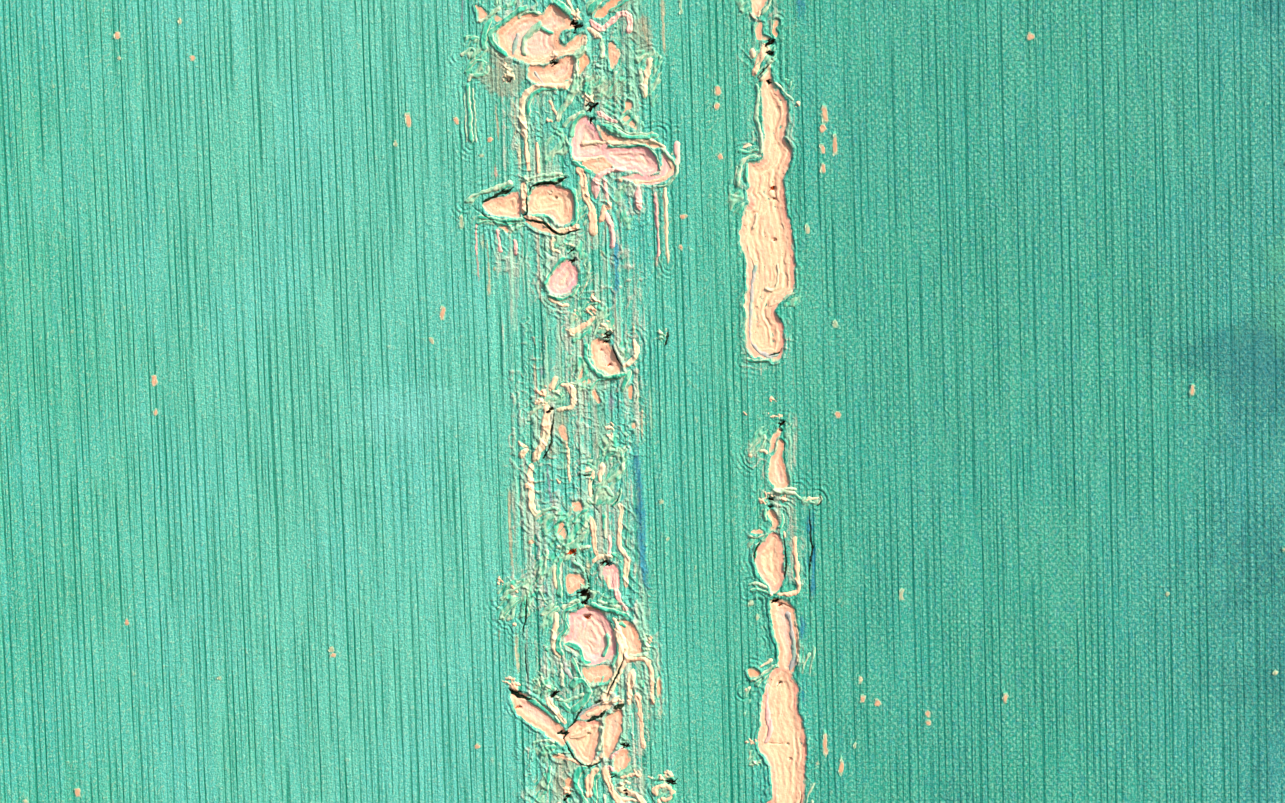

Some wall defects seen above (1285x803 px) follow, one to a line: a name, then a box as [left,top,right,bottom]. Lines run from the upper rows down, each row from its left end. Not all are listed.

peeling [717,0,810,363]
peeling [453,0,688,803]
peeling [742,396,857,803]